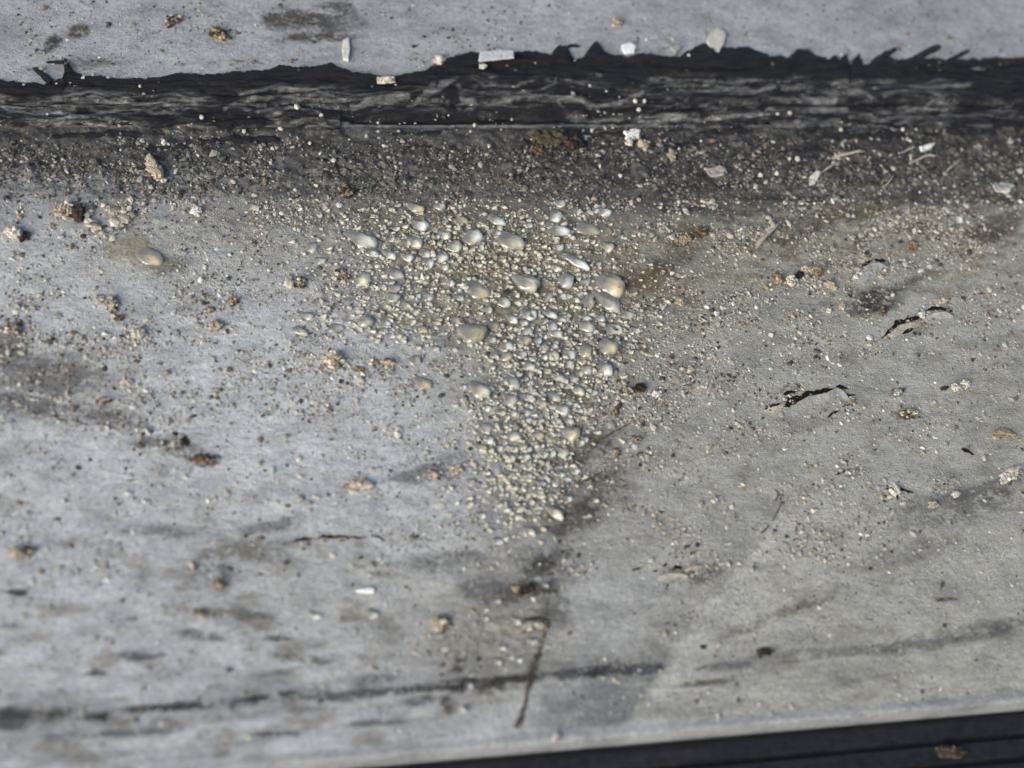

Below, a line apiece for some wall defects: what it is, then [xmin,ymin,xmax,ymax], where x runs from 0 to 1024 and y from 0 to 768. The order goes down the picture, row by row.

crack [881,304,956,341]
leakage [563,436,612,464]
leakage [547,502,598,535]